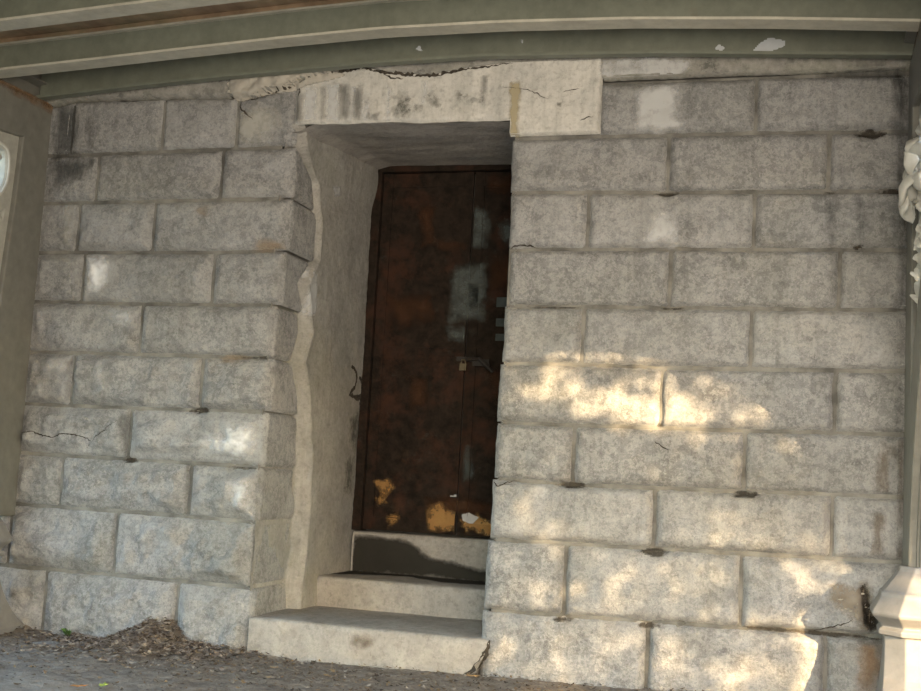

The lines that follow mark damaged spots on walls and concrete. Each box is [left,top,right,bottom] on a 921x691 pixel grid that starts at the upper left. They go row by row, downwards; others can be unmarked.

spalling [227,71,344,102]
crack [232,63,509,118]
crack [22,421,116,446]
spalling [831,583,878,630]
crack [464,640,490,674]